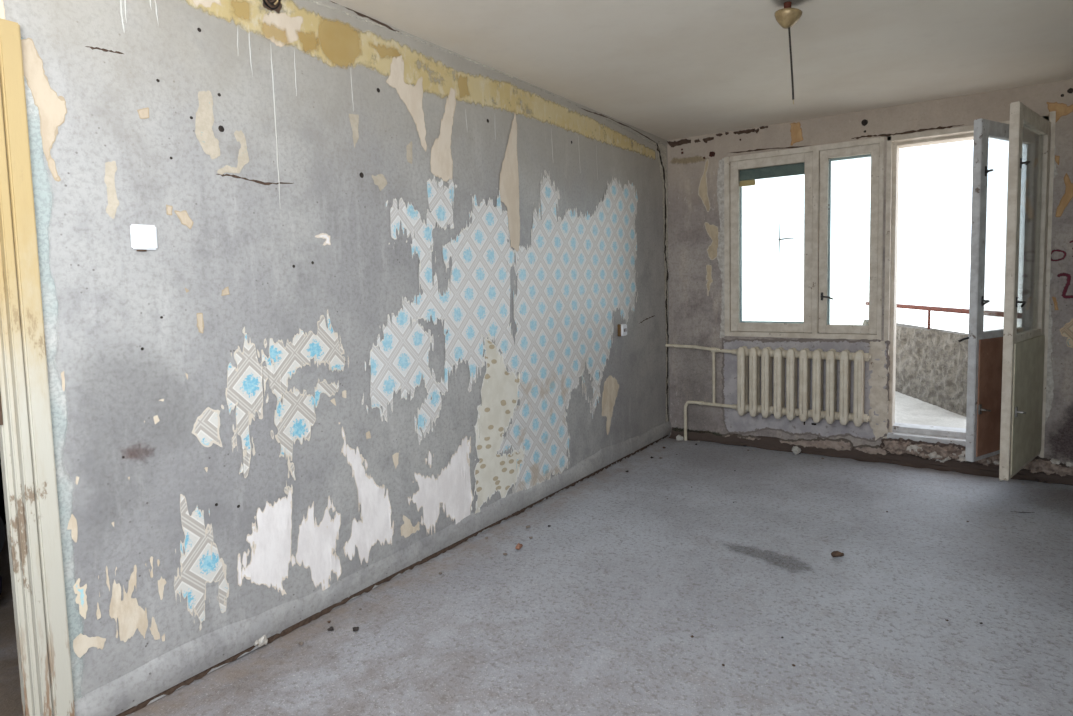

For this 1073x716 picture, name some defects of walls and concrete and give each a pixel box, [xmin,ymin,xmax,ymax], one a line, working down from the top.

peeling [262,12,303,47]
peeling [217,130,249,175]
peeling [1045,272,1059,423]
peeling [24,76,83,701]
water stain [1049,408,1073,460]
spalling [1020,456,1073,477]